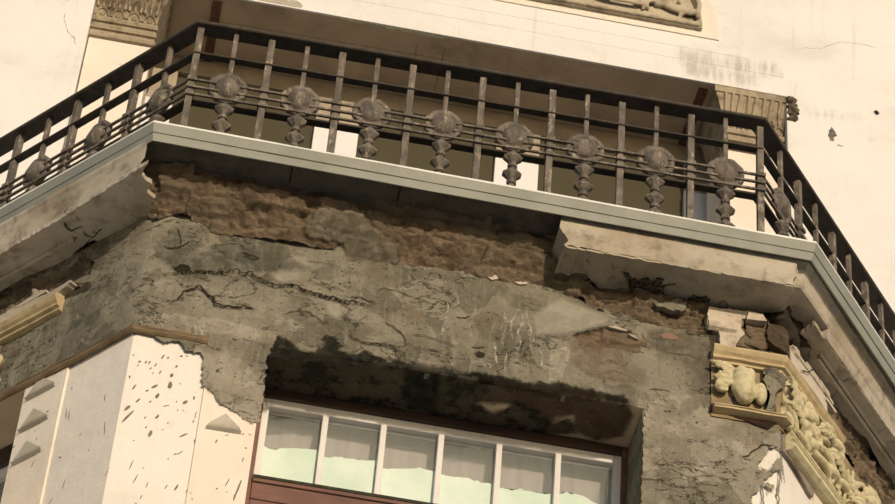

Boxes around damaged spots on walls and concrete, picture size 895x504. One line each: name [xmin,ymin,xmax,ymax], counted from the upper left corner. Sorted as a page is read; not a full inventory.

crack [64,209,102,253]
spalling [143,162,712,353]
crack [149,230,483,351]
damp [326,303,343,318]
damp [504,297,611,346]
spalling [737,306,811,362]
damp [263,335,632,440]
spalling [731,367,786,429]